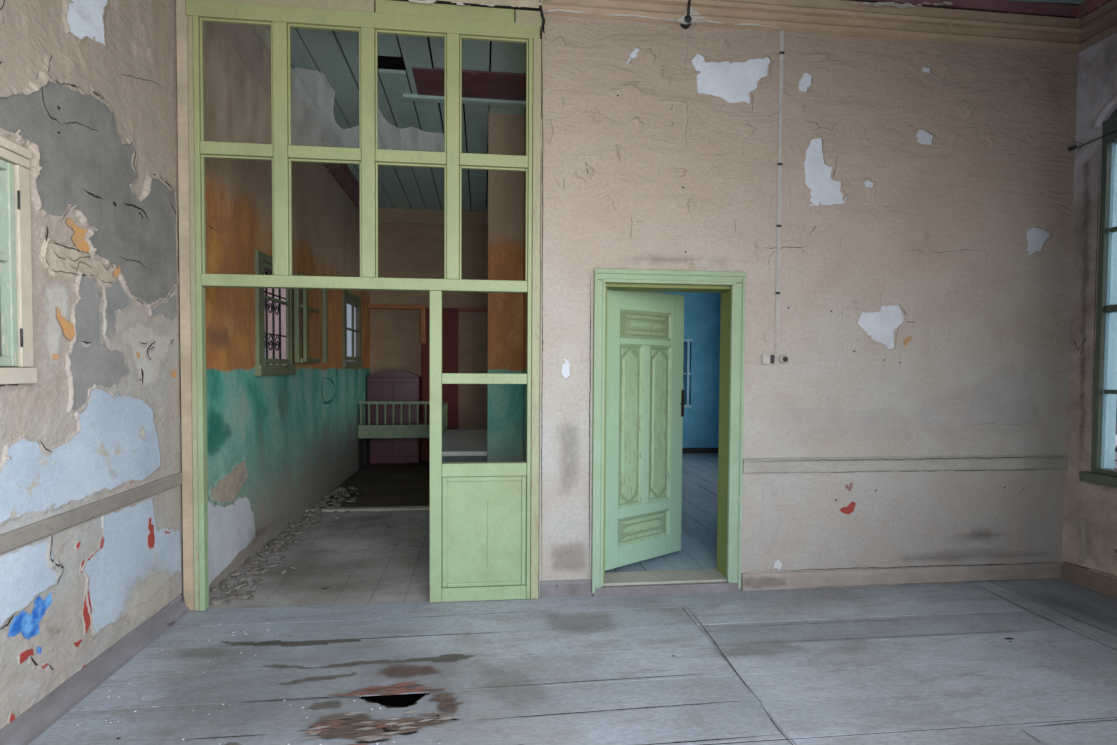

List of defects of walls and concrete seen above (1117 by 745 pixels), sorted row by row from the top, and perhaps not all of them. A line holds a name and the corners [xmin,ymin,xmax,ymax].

peeling [62,0,110,50]
peeling [689,52,772,106]
peeling [797,71,813,94]
peeling [913,128,935,146]
peeling [802,136,849,208]
peeling [1025,226,1054,257]
flaking render [0,68,179,527]
peeling [856,303,907,351]
peeling [208,455,256,589]
peeling [72,497,182,649]
peeling [0,536,65,671]